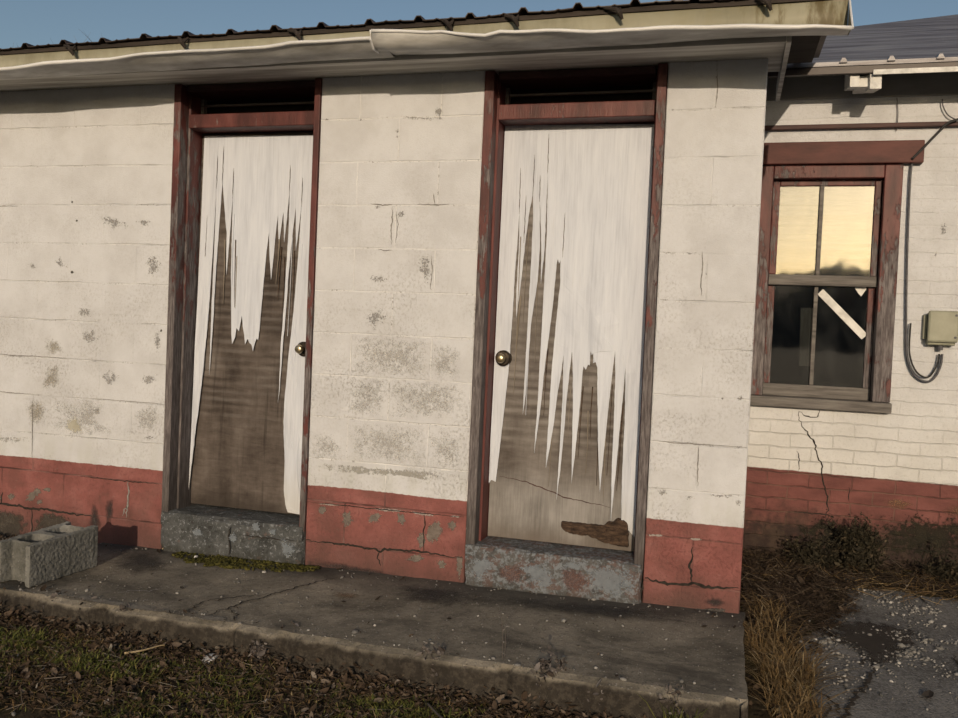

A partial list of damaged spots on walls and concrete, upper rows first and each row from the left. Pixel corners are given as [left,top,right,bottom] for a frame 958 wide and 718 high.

leakage [326,465,438,480]
crack [795,411,850,521]
crack [228,503,463,566]
peeling [368,508,459,562]
leakage [798,518,854,551]
leakage [874,513,958,564]
crack [188,577,337,620]
peeling [438,556,634,597]
crack [640,547,737,603]
crack [795,657,876,718]